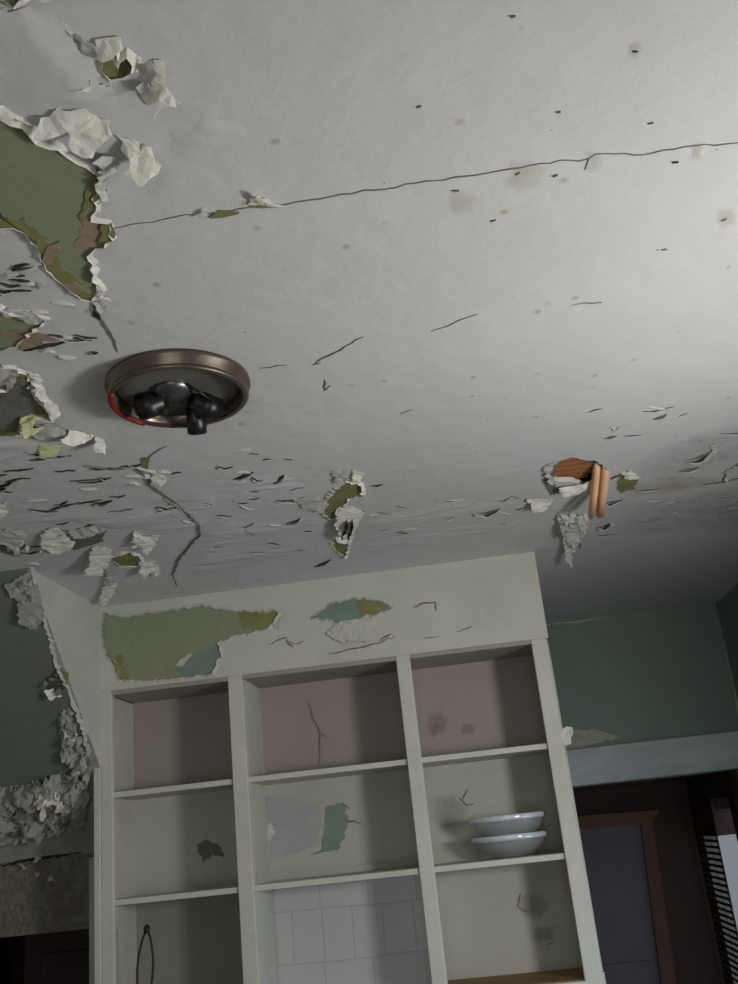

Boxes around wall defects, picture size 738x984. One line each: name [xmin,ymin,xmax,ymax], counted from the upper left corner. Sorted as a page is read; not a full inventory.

peeling [66,30,180,118]
peeling [0,105,161,302]
crack [114,142,738,229]
peeling [0,304,55,352]
peeling [0,364,107,458]
crack [86,446,201,586]
peeling [293,470,367,560]
peeling [526,461,591,568]
peeling [617,470,640,493]
peeling [310,596,396,655]
peeling [0,526,303,848]
crack [1,852,81,881]